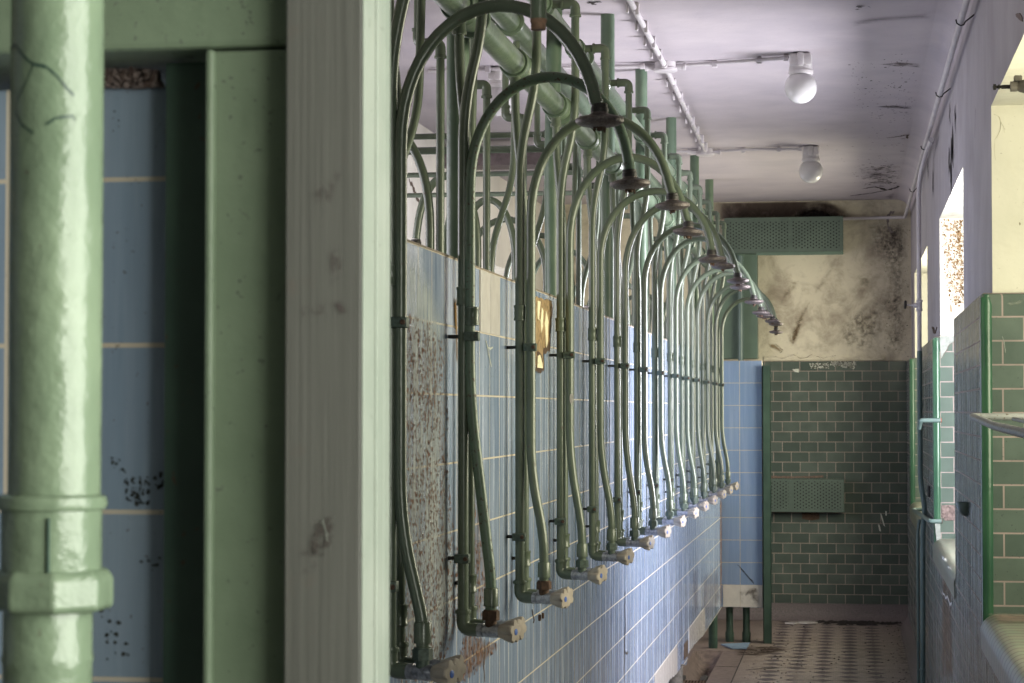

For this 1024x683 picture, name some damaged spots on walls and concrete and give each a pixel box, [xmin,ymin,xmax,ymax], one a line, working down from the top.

crack [10,43,76,134]
water stain [111,457,164,506]
corrosion [407,271,501,683]